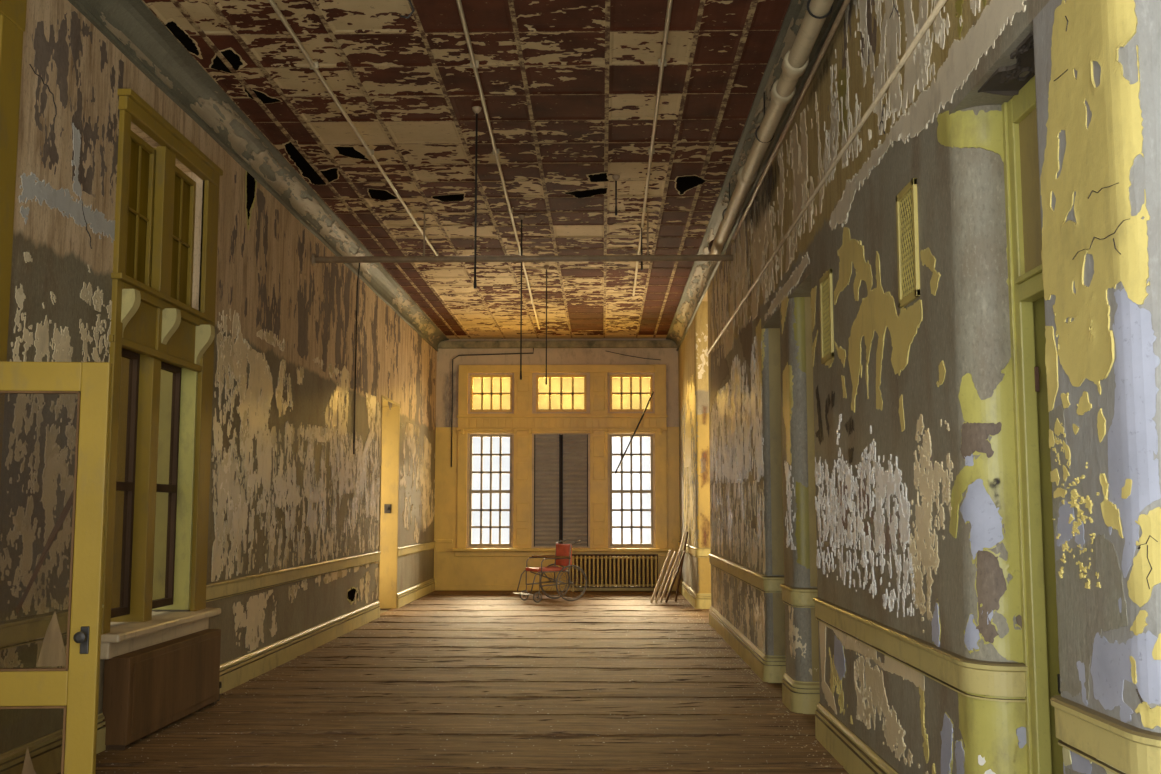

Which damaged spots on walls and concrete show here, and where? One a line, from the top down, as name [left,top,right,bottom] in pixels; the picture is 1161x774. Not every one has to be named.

peeling [0,394,78,620]
peeling [10,264,112,362]
peeling [190,91,440,653]
peeling [670,0,1026,663]
peeling [788,603,1027,774]
peeling [1040,0,1161,729]